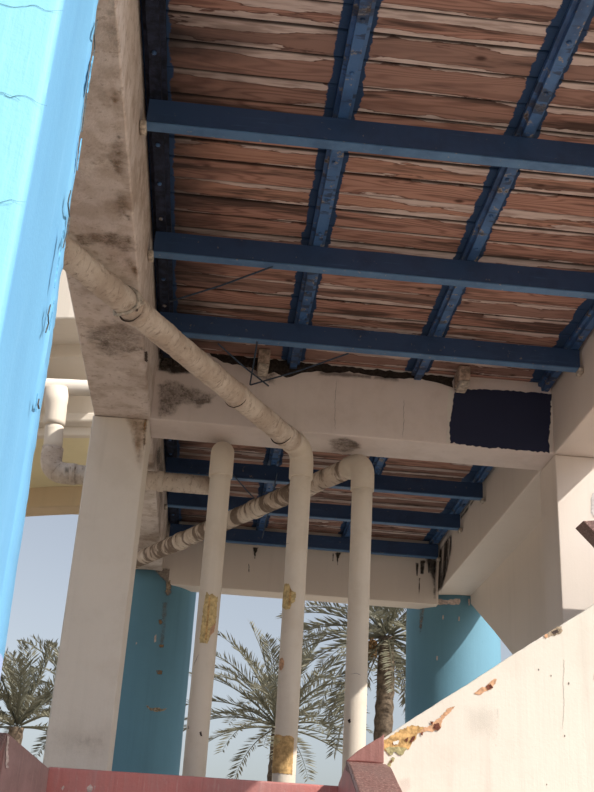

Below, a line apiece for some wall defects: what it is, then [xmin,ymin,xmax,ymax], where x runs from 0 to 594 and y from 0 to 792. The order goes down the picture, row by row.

water stain [159,352,210,413]
peeling [199,592,218,644]
peeling [282,583,296,610]
peeling [475,679,497,695]
peeling [272,734,294,775]
peeling [384,706,455,767]